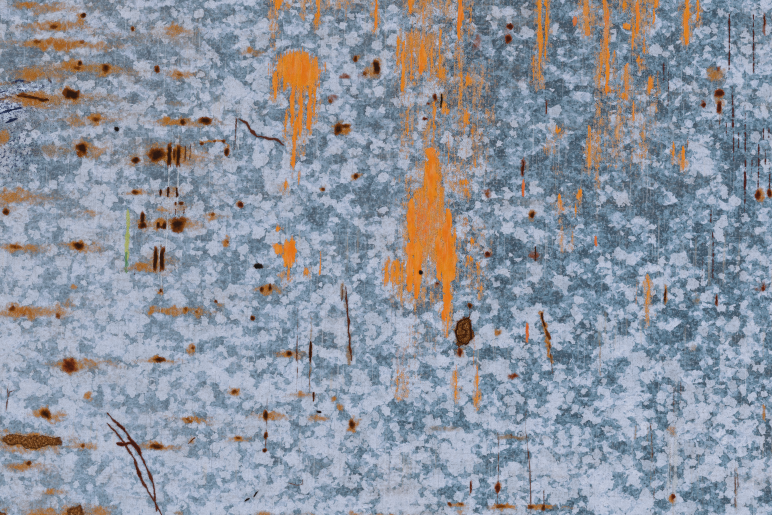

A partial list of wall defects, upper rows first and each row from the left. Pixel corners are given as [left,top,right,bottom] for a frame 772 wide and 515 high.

corrosion [359,59,381,78]
corrosion [707,14,772,212]
corrosion [129,139,230,168]
corrosion [125,246,171,275]
corrosion [538,311,554,373]
corrosion [0,429,97,472]
corrosion [28,505,110,515]